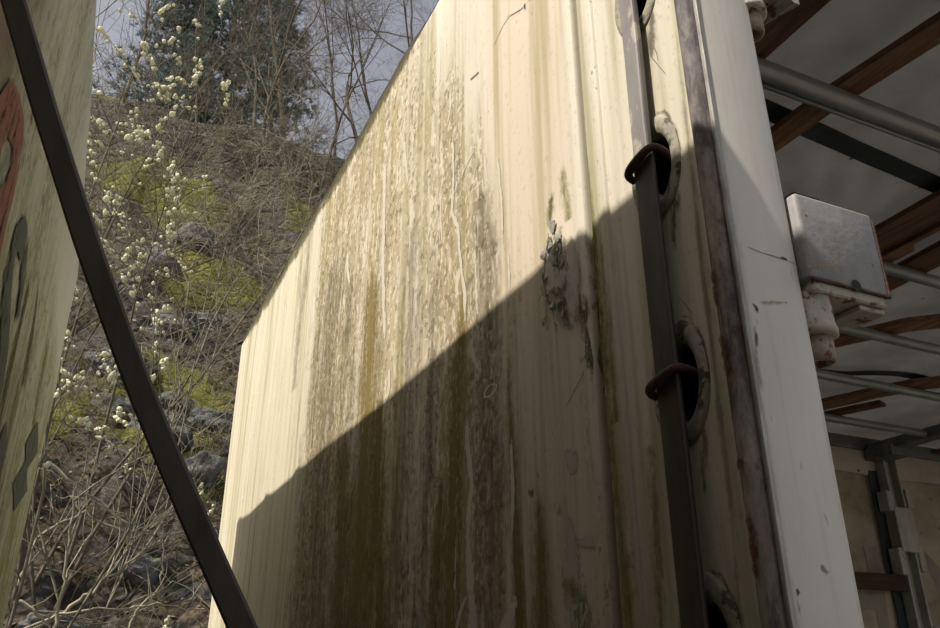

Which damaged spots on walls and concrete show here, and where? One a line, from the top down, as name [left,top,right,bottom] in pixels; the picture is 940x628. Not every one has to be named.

leakage [440,135,510,321]
leakage [548,172,570,221]
spalling [538,220,580,330]
leakage [373,369,390,628]
leakage [428,482,443,628]
leakage [453,415,478,628]
leakage [498,438,517,628]
leakage [533,500,548,628]